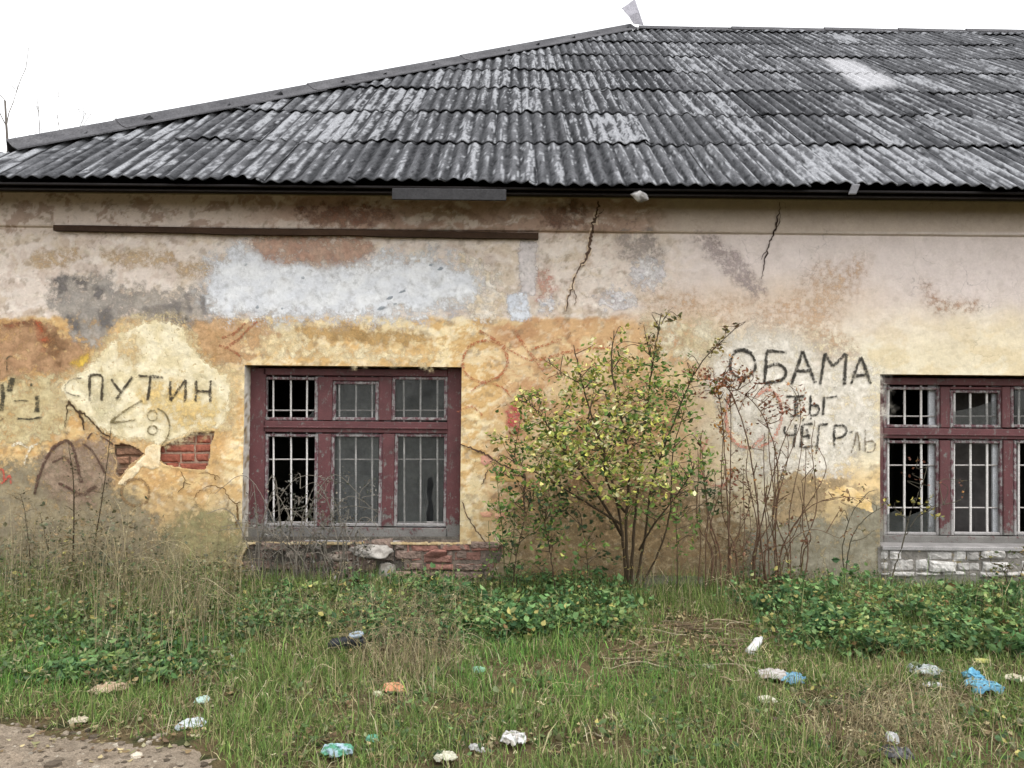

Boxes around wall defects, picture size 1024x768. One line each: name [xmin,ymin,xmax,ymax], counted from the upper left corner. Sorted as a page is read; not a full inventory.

crack [564,201,604,338]
crack [761,203,781,279]
peeling [0,311,243,486]